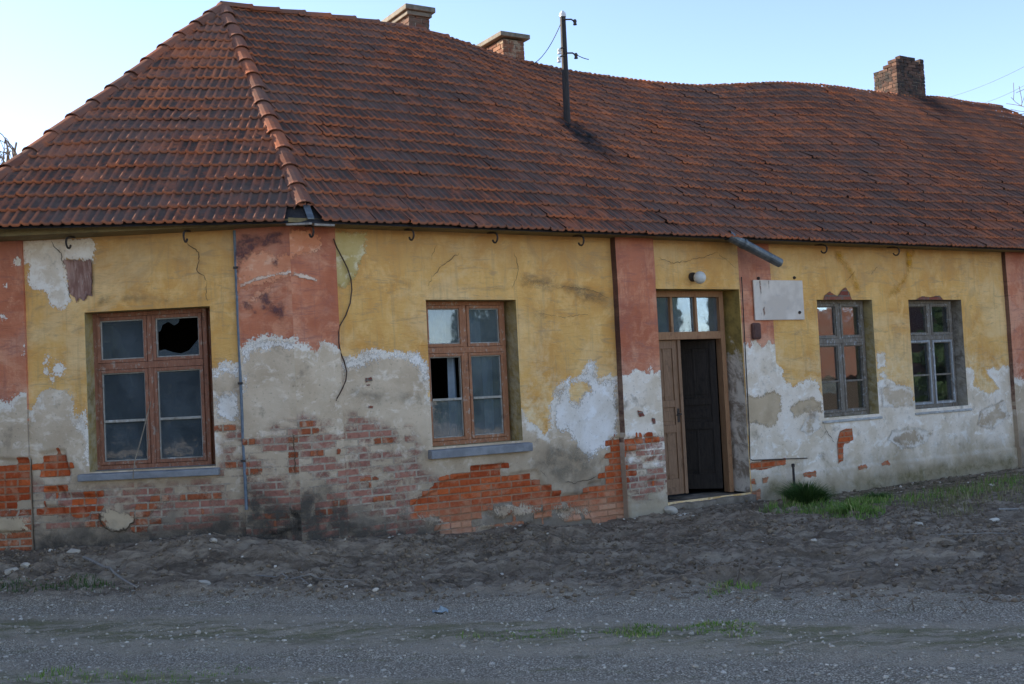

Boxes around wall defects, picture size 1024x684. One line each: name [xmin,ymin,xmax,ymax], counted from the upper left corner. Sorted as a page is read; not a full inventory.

peeling [13,238,96,311]
water stain [185,493,427,541]
peeling [0,332,668,551]
peeling [743,340,1024,500]